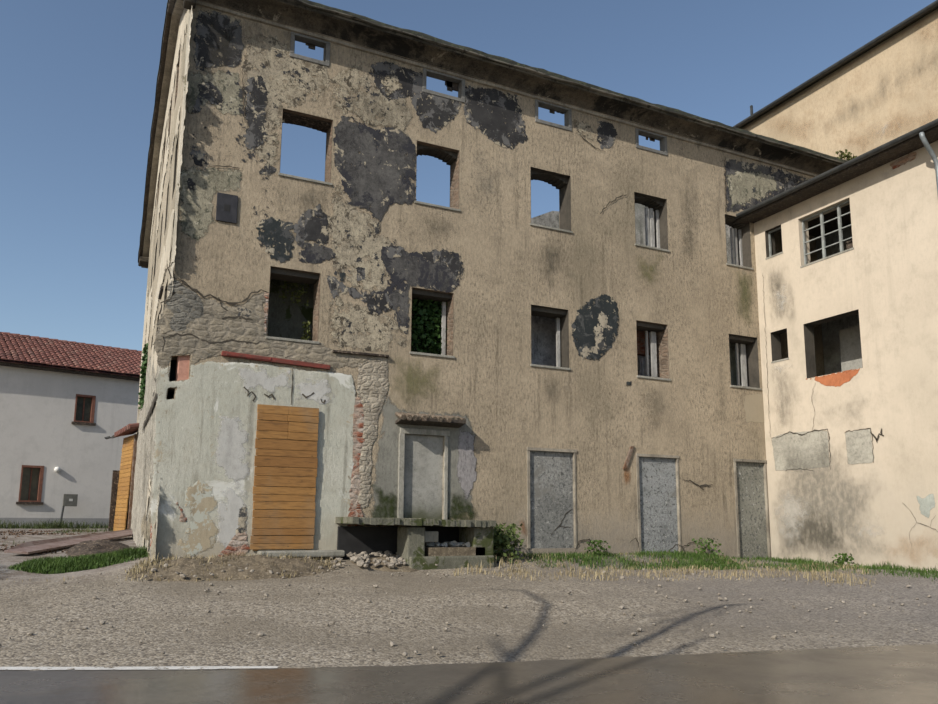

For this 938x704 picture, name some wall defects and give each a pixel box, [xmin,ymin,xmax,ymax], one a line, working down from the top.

spalling [724,157,809,213]
spalling [131,7,528,560]
peeling [571,294,619,361]
crack [776,393,884,471]
water stain [784,466,855,543]